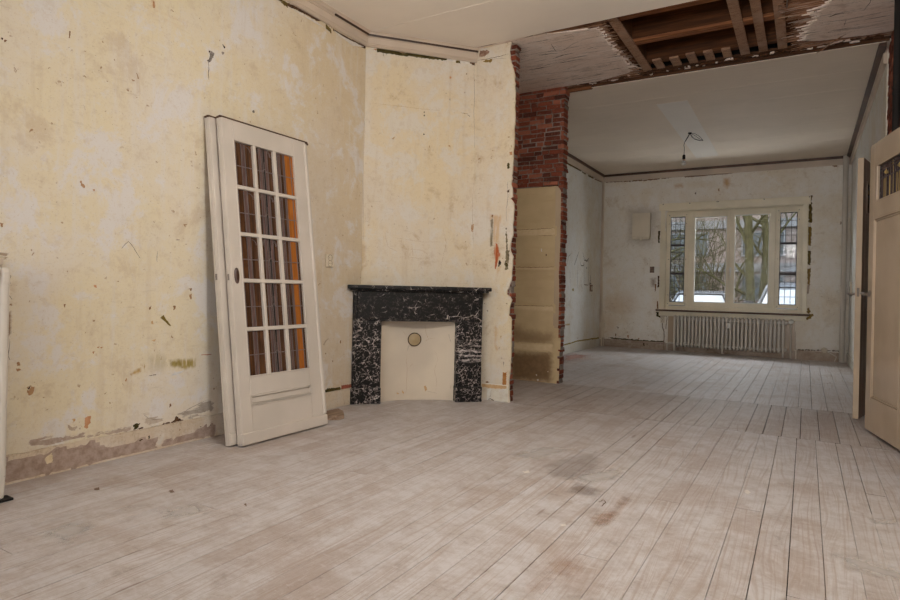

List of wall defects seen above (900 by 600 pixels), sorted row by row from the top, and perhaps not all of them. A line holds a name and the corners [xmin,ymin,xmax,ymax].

spalling [277,0,366,50]
spalling [5,392,219,485]